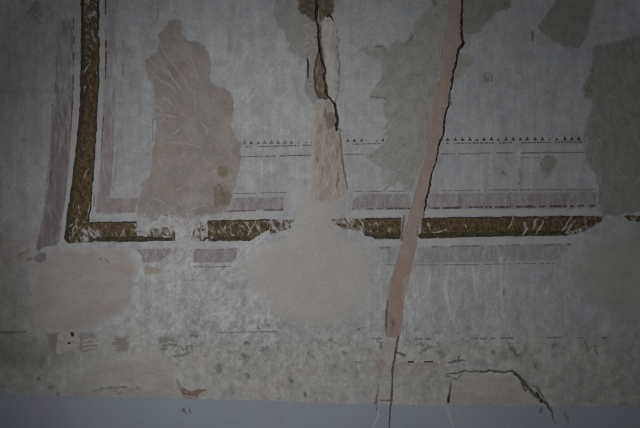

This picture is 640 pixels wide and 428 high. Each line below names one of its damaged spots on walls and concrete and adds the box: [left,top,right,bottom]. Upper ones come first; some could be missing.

peeling [136,18,243,227]
peeling [272,0,338,105]
crack [313,0,348,191]
peeling [357,0,448,196]
crack [423,0,465,220]
peeling [531,0,640,220]
crack [374,336,407,428]
crack [445,369,554,420]